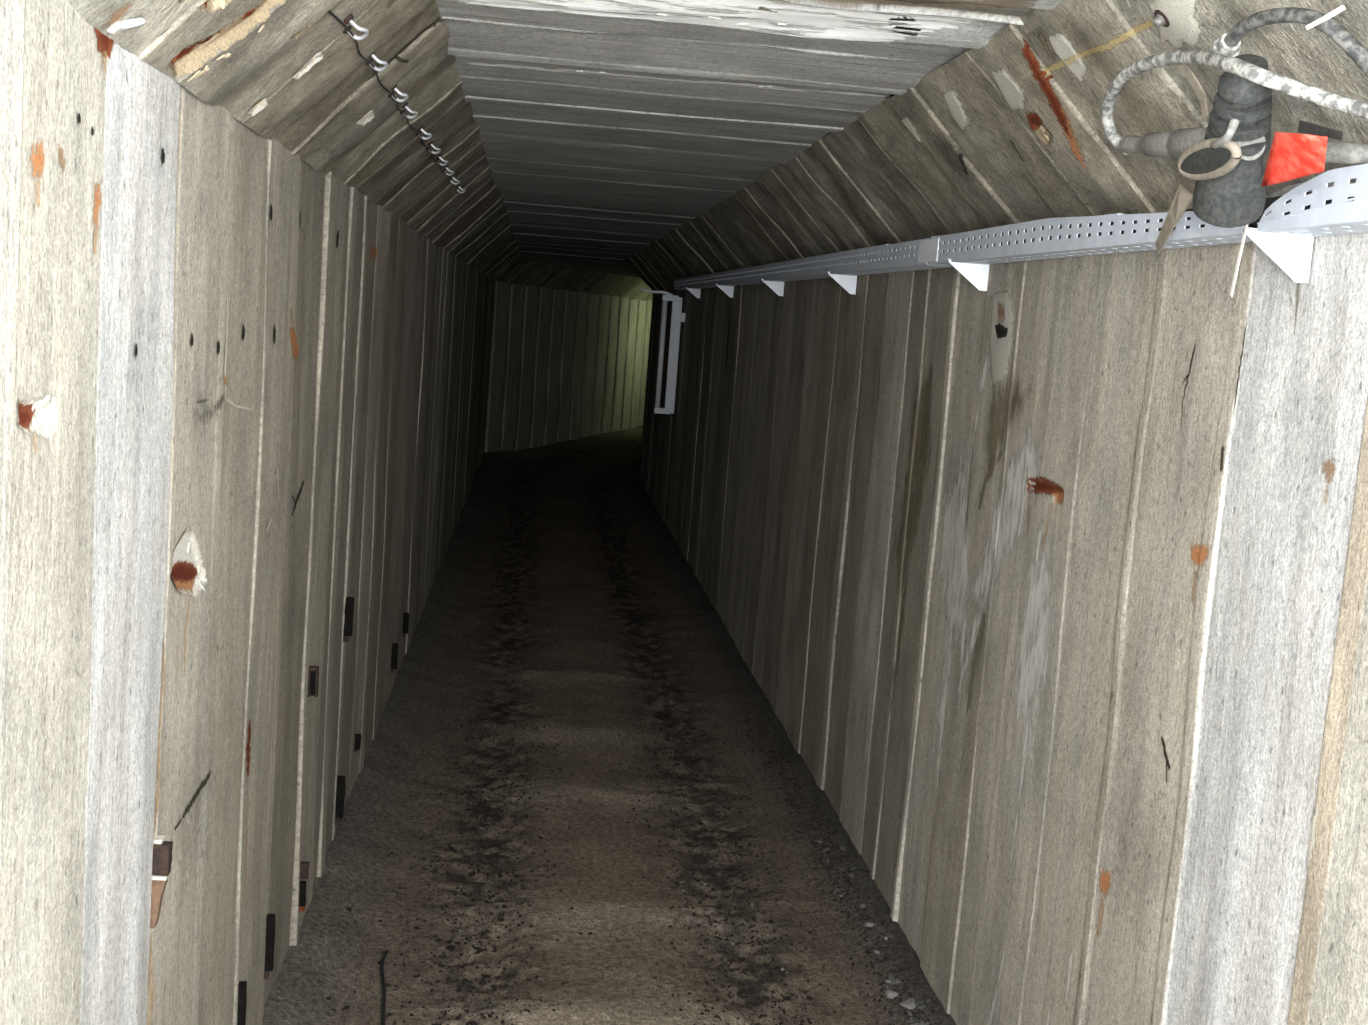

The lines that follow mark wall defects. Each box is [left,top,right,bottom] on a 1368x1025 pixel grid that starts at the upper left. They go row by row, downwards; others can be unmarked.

spalling [169,0,285,82]
rust [30,142,66,206]
spalling [16,396,58,452]
rust [1026,476,1064,551]
spalling [170,528,208,672]
rust [1191,543,1211,603]